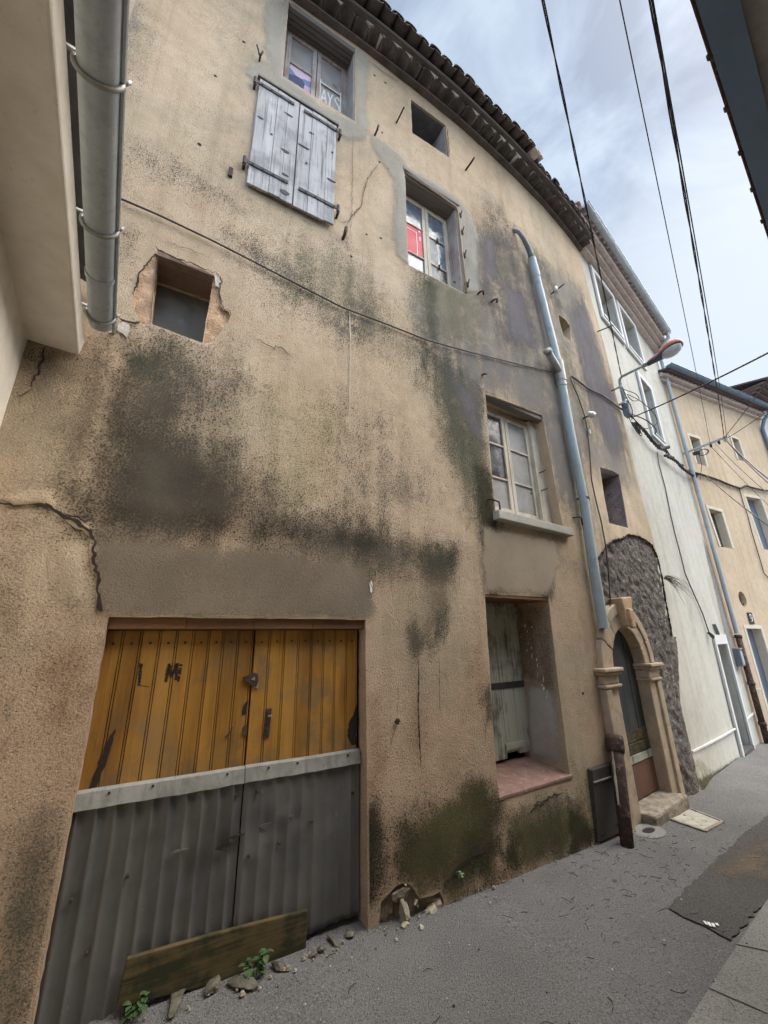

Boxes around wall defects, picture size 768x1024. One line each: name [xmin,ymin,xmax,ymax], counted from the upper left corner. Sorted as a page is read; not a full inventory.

crack [344,134,378,251]
flaking render [117,255,157,338]
flaking render [204,275,230,344]
crack [18,347,45,396]
water stain [0,147,636,767]
crack [0,486,101,595]
flaking render [379,883,443,924]